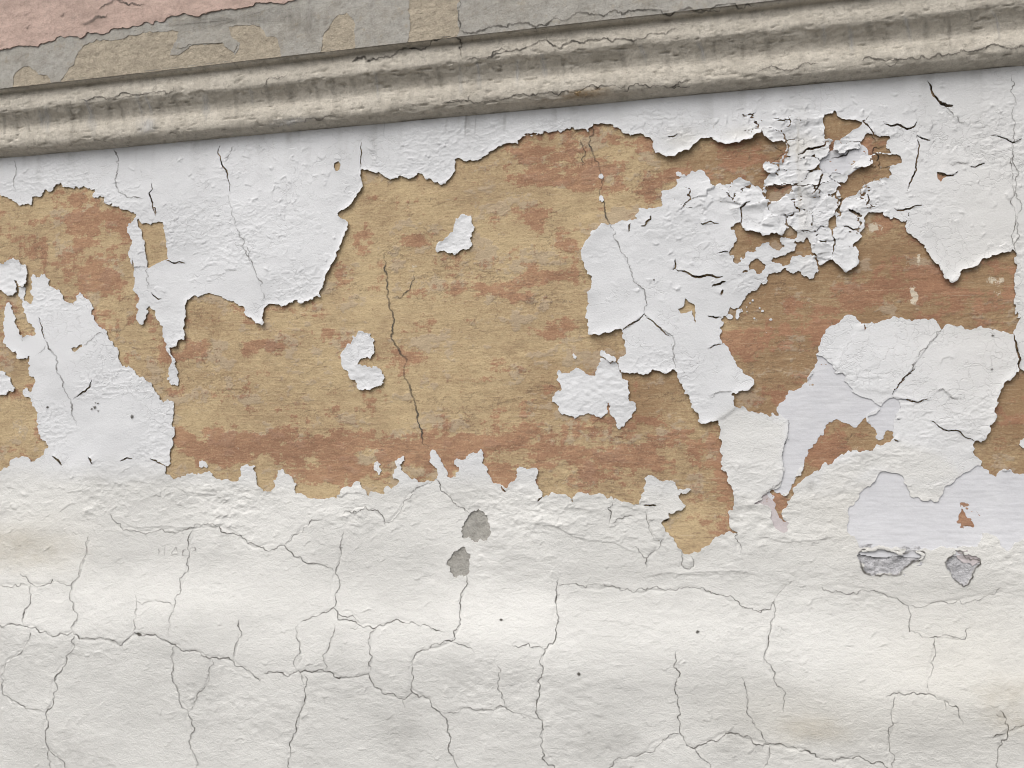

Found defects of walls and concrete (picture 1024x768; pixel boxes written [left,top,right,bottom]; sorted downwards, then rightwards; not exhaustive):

peeling [10,25,283,88]
peeling [317,13,355,53]
peeling [405,0,460,43]
crack [353,2,750,62]
crack [865,43,1022,67]
crack [444,84,603,103]
crack [384,264,415,356]
peeling [0,111,1024,587]
crack [409,385,423,440]
crack [0,503,784,767]
crack [827,589,998,668]
crack [609,656,929,768]